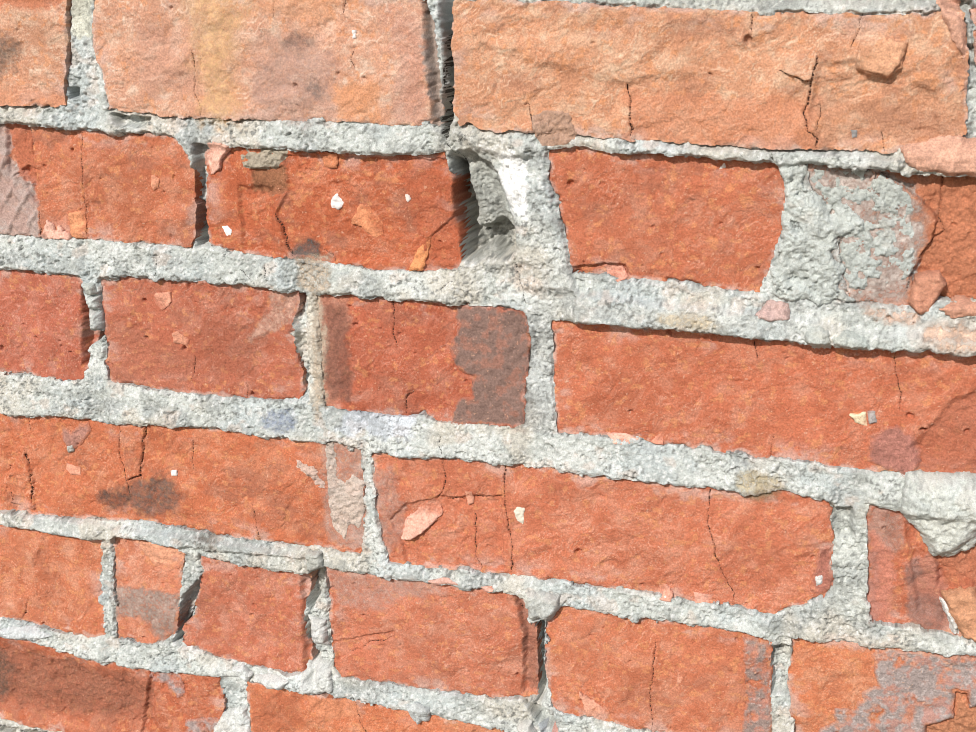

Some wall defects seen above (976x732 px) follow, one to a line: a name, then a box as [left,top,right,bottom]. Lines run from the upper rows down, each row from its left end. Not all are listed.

spalling [936,0,967,60]
crack [780,55,821,146]
spalling [900,135,976,319]
crack [119,426,147,493]
crack [439,437,514,570]
crack [707,488,735,598]
spalling [939,586,976,642]
spalling [818,648,976,732]